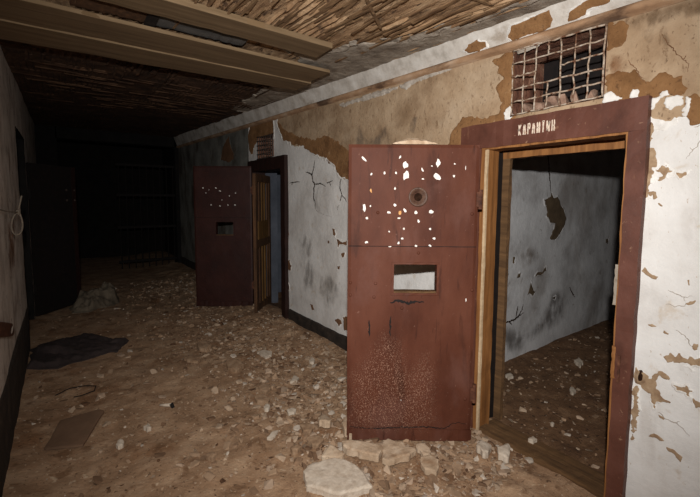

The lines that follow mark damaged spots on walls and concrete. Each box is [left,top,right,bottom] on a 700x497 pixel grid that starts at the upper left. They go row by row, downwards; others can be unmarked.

flaking render [231,0,700,207]
crack [290,161,346,210]
flaking render [543,192,566,240]
flaking render [328,228,348,270]
flaking render [664,344,700,373]
flaking render [629,367,700,441]
flaking render [649,433,682,462]